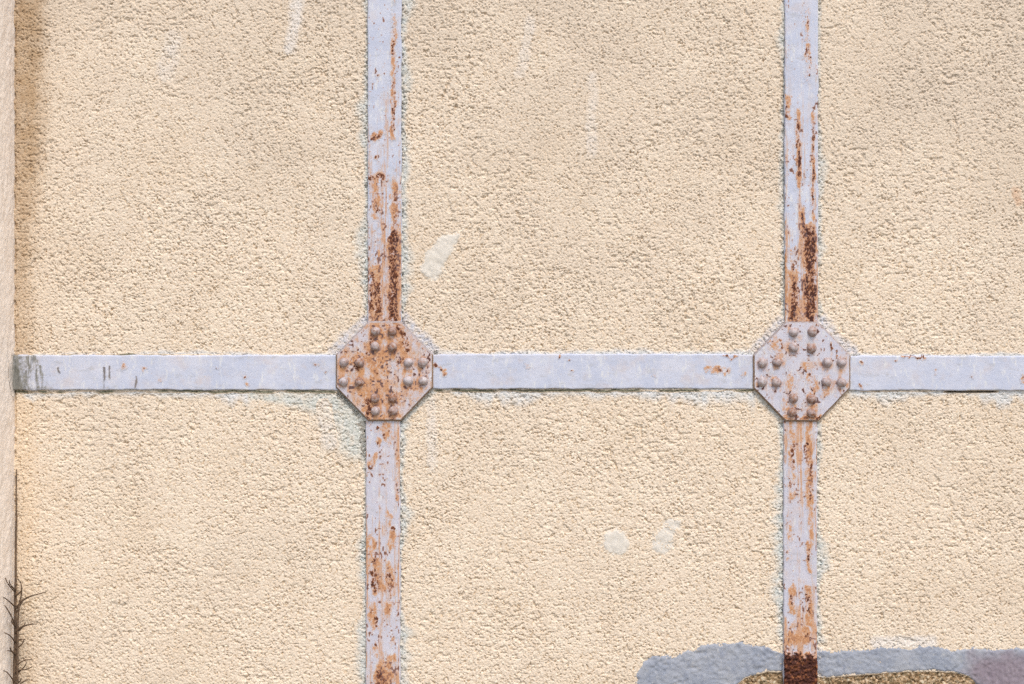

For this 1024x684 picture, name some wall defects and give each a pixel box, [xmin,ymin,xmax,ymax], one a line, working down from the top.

rust [312,0,448,684]
spalling [740,672,783,684]
rust [703,0,864,684]
spalling [817,671,975,684]